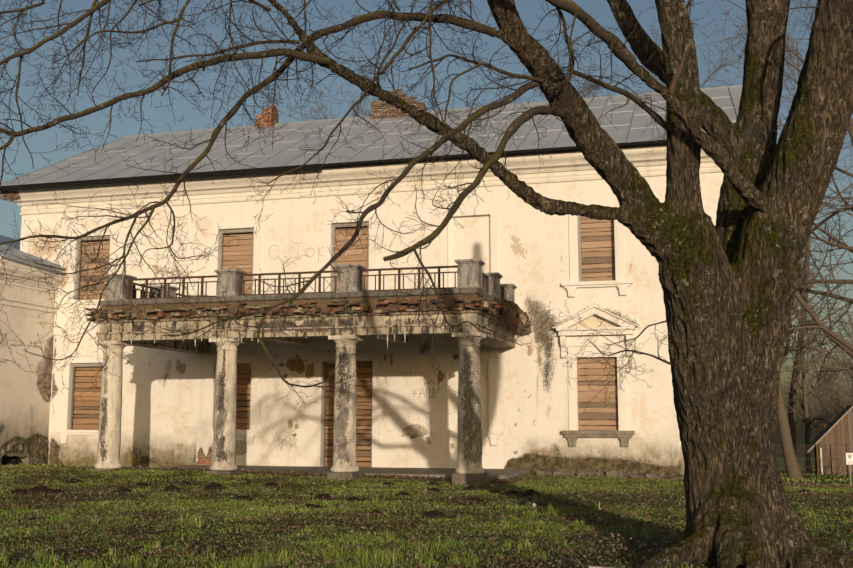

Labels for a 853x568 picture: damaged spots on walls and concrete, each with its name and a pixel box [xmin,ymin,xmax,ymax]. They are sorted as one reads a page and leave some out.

spalling [1,457,23,466]
flaking render [36,334,59,404]
spalling [33,439,63,466]
flaking render [189,445,213,465]
leakage [215,349,233,462]
flaking render [279,355,314,379]
leakage [335,342,351,463]
flaking render [402,424,432,446]
leakage [460,347,483,464]
leakage [526,299,557,389]